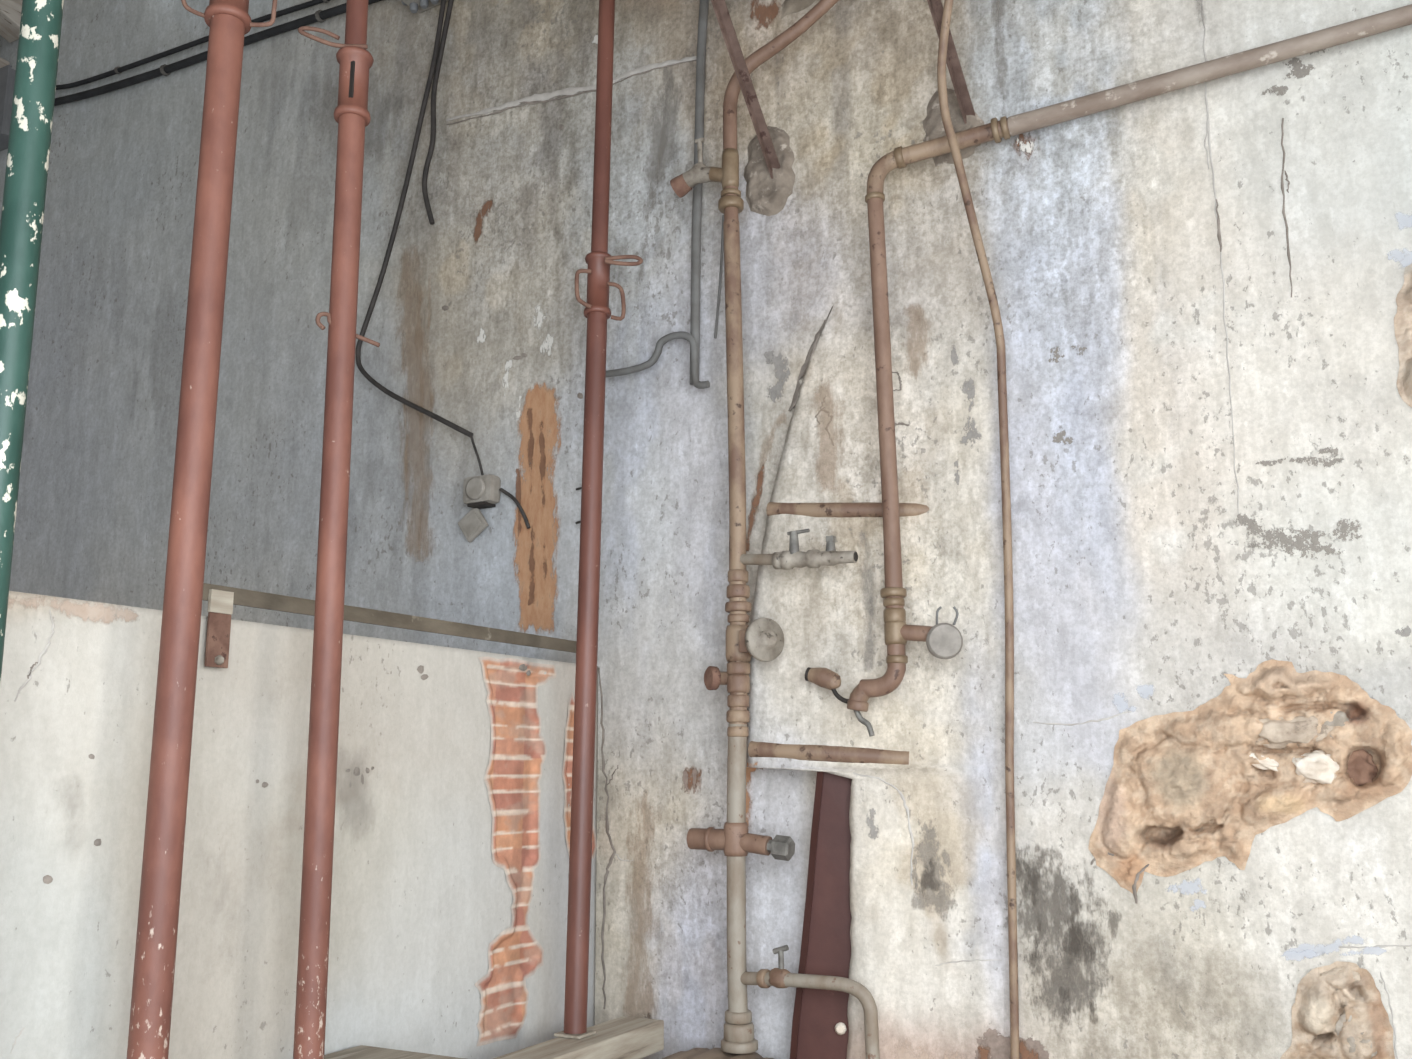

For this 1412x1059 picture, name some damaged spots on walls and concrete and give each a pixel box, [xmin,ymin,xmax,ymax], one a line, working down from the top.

crack [446,56,697,125]
crack [1281,118,1292,297]
flaking render [1388,249,1412,408]
flaking render [475,656,557,1046]
leakage [1018,847,1110,1028]
flaking render [1088,659,1412,911]
flaking render [1280,936,1395,1059]